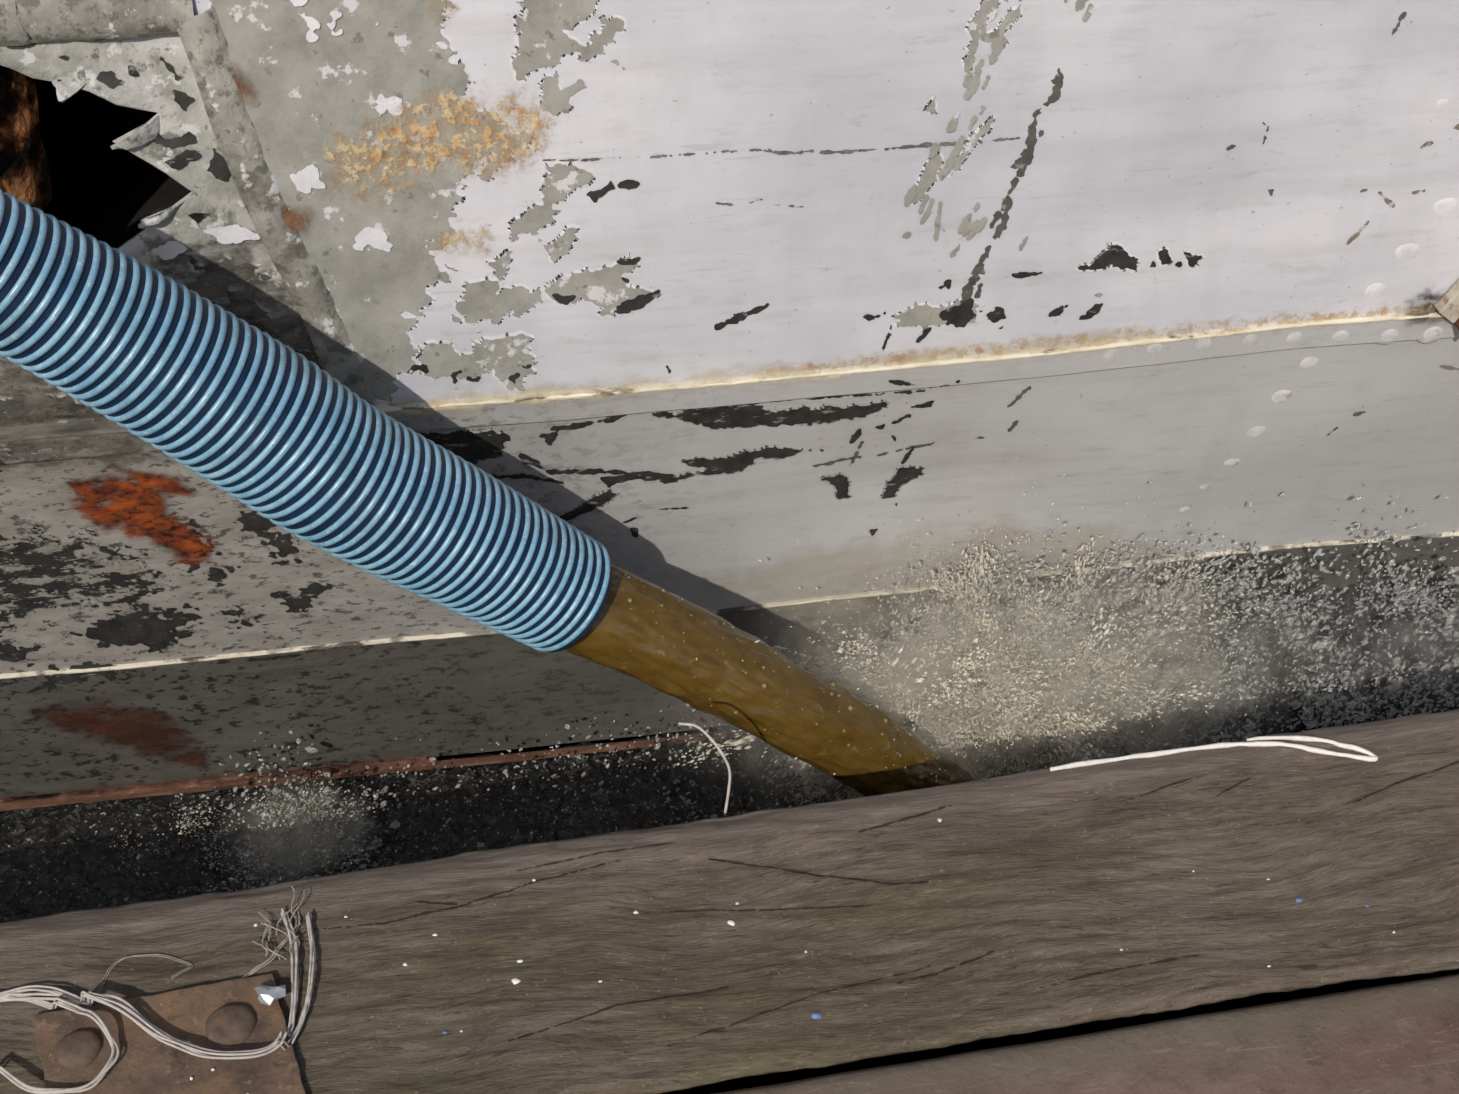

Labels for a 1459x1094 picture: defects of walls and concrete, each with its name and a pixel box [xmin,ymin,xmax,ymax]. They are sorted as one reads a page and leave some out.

peeling [151,131,231,182]
corrosion [323,91,554,196]
peeling [902,0,1023,258]
peeling [208,0,661,413]
peeling [1076,241,1204,273]
peeling [863,279,1006,350]
peeling [1048,293,1103,322]
peeling [414,380,960,522]
corrosion [68,467,209,564]
peeling [233,511,304,565]
peeling [0,519,240,693]
peeling [221,582,332,629]